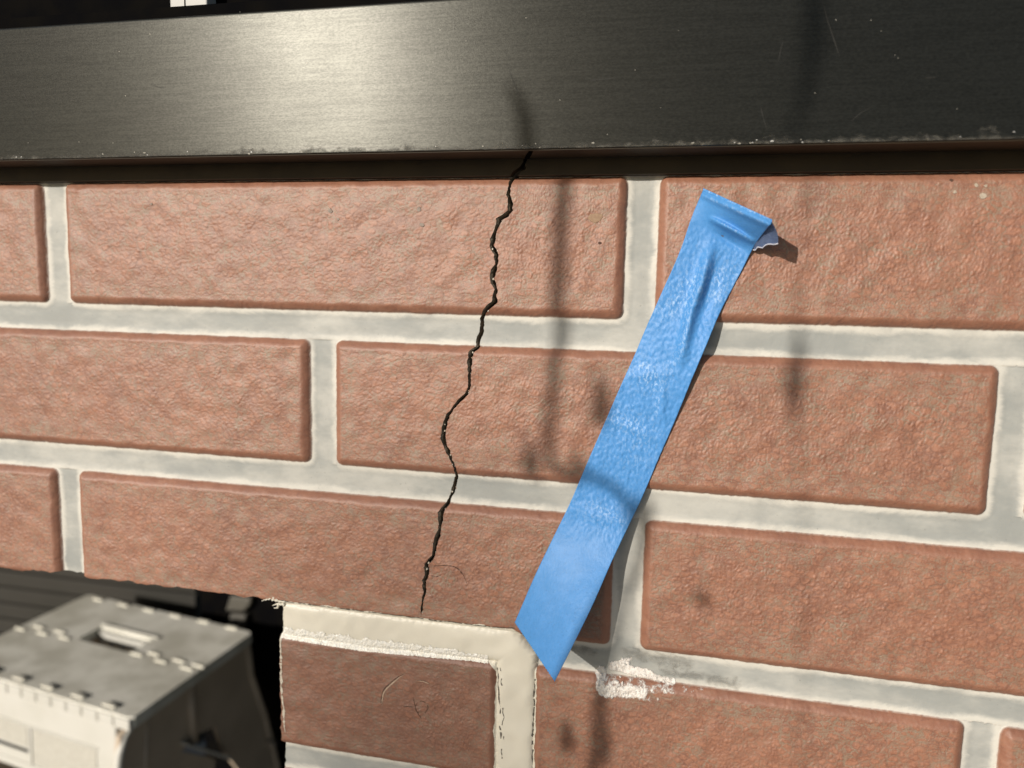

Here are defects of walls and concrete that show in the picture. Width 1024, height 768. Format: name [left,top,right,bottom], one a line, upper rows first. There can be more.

crack [278,151,533,629]